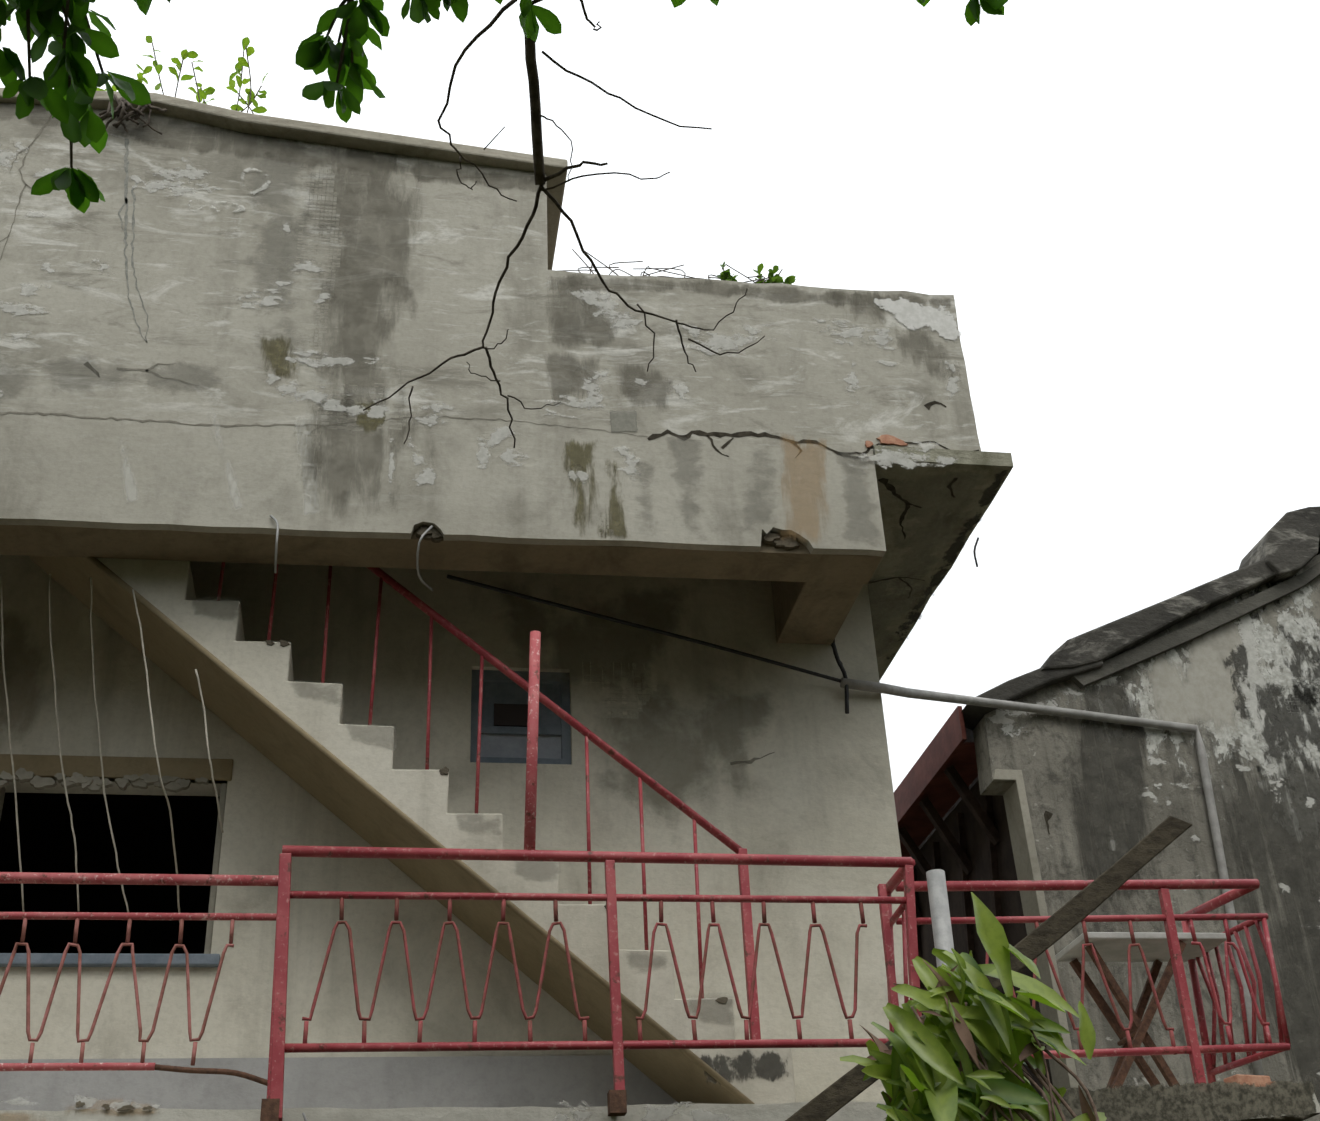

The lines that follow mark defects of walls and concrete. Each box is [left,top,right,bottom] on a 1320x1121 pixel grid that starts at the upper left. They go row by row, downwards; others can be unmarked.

crack [0,123,48,260]
flaking render [131,160,222,196]
crack [84,138,199,386]
water stain [105,116,539,506]
water stain [550,276,673,404]
flaking render [816,297,963,366]
crack [924,401,946,410]
crack [0,411,979,539]
water stain [605,464,626,538]
peeling [988,585,1320,842]
spalling [0,768,209,793]
water stain [1224,626,1320,1102]